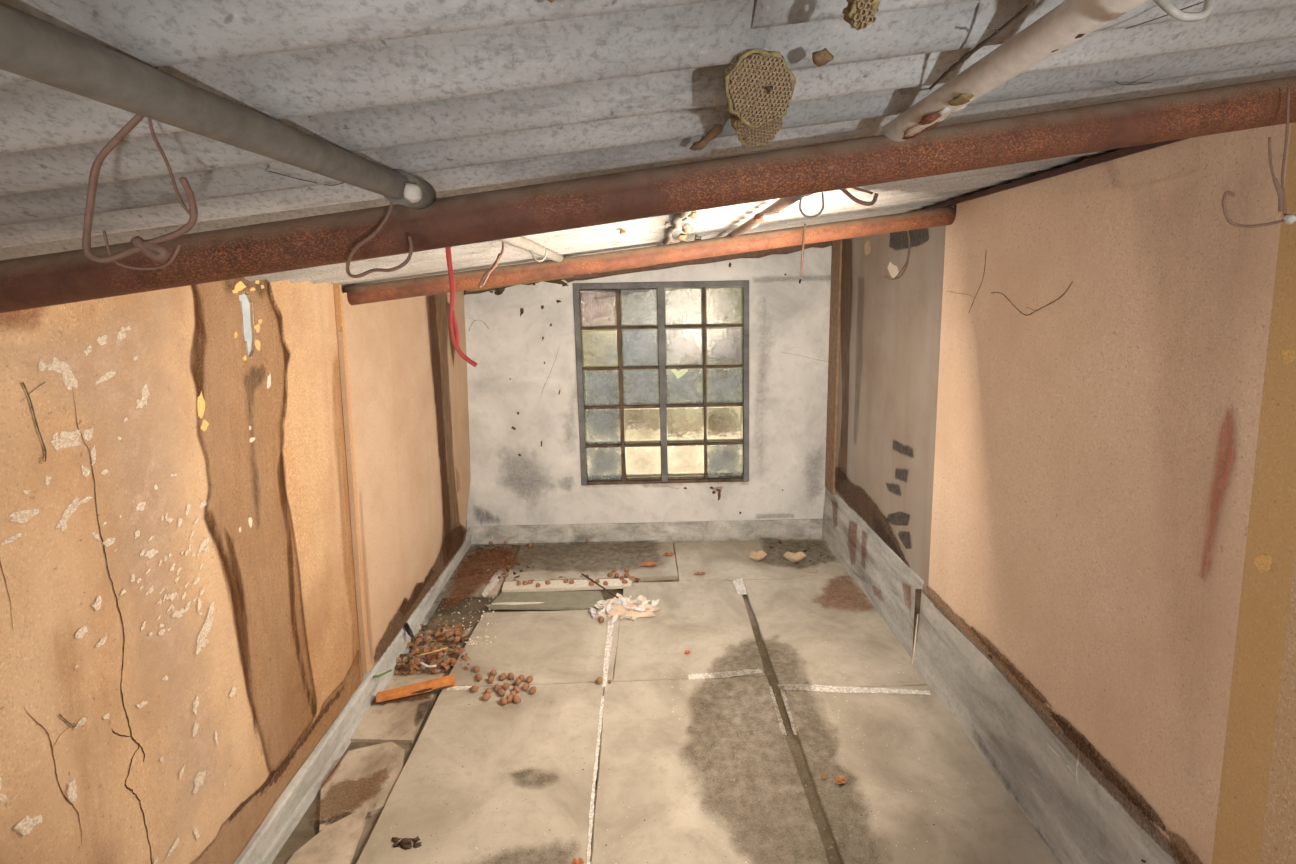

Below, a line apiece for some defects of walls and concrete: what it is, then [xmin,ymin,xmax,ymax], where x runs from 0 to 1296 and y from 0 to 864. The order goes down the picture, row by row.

peeling [197,391,209,431]
spalling [232,280,265,294]
spalling [242,318,262,361]
leakage [835,239,913,568]
crack [66,359,152,864]
crack [25,709,82,864]
peeling [179,765,206,793]
leakage [514,770,556,784]
leakage [587,621,614,864]
leakage [687,640,931,864]
leakage [922,582,1202,864]